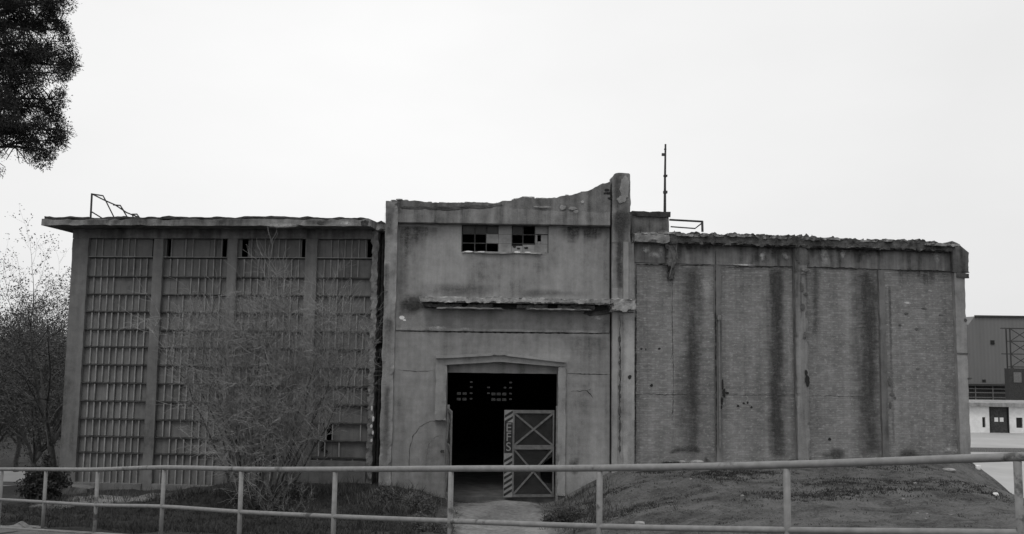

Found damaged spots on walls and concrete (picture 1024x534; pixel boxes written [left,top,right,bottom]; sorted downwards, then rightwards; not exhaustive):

flaking render [604,175,629,203]
damp [771,272,782,446]